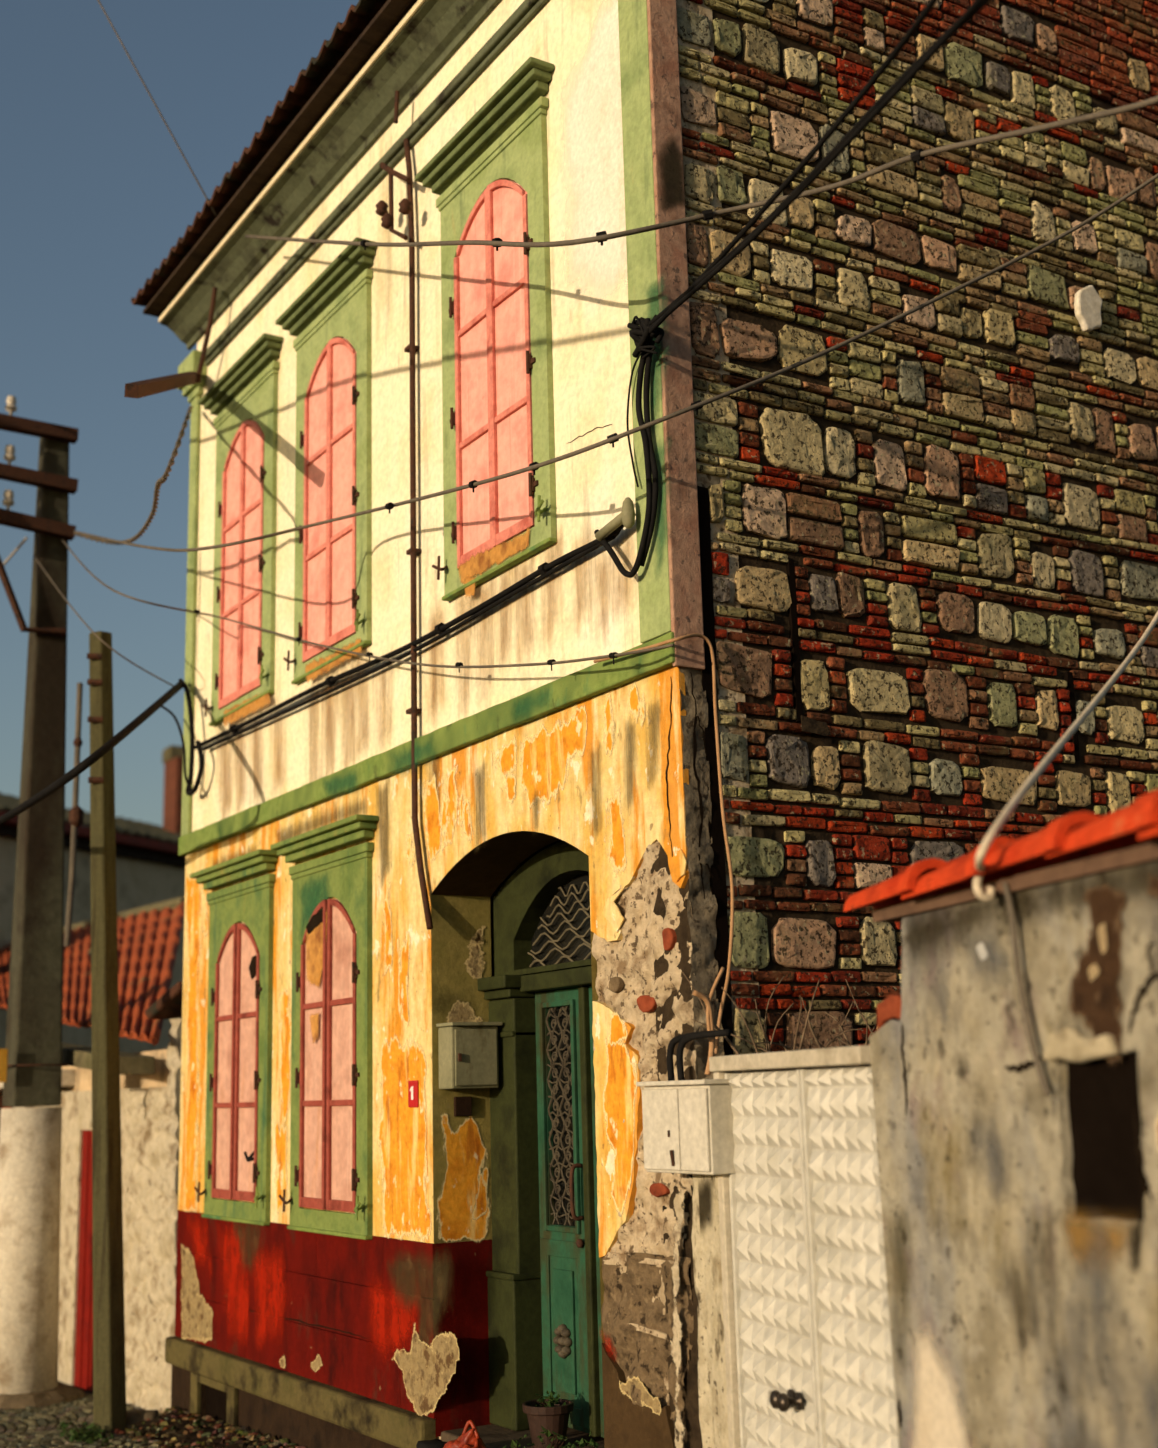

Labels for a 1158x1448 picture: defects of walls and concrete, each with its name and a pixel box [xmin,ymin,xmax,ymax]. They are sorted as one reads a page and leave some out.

water stain [278,775,388,880]
peeling [406,767,472,866]
water stain [476,773,485,832]
peeling [490,705,587,808]
peeling [603,683,650,755]
flaking render [1069,884,1126,1064]
crack [1128,936,1158,1035]
peeling [181,873,285,1343]
peeling [378,883,490,1242]
flaking render [592,786,696,1448]
flaking render [372,1288,459,1416]